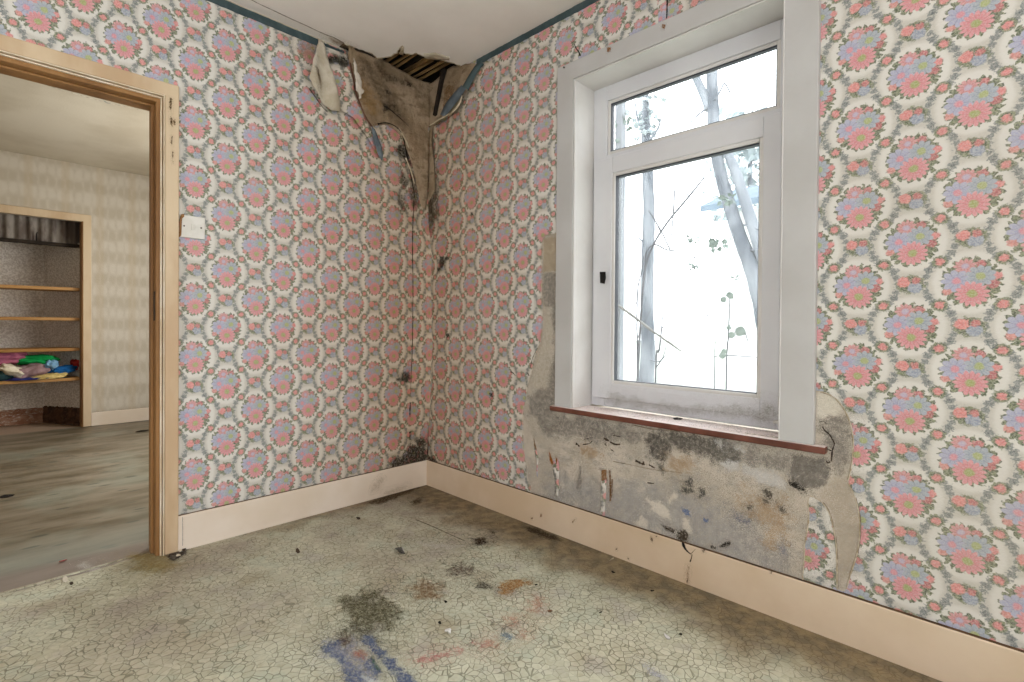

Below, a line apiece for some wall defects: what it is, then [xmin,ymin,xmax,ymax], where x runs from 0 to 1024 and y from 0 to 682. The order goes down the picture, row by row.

flaking render [344,43,476,210]
water stain [396,139,441,235]
mould [388,436,437,467]
flaking render [522,233,861,592]
water stain [526,237,863,588]
crack [820,421,835,464]